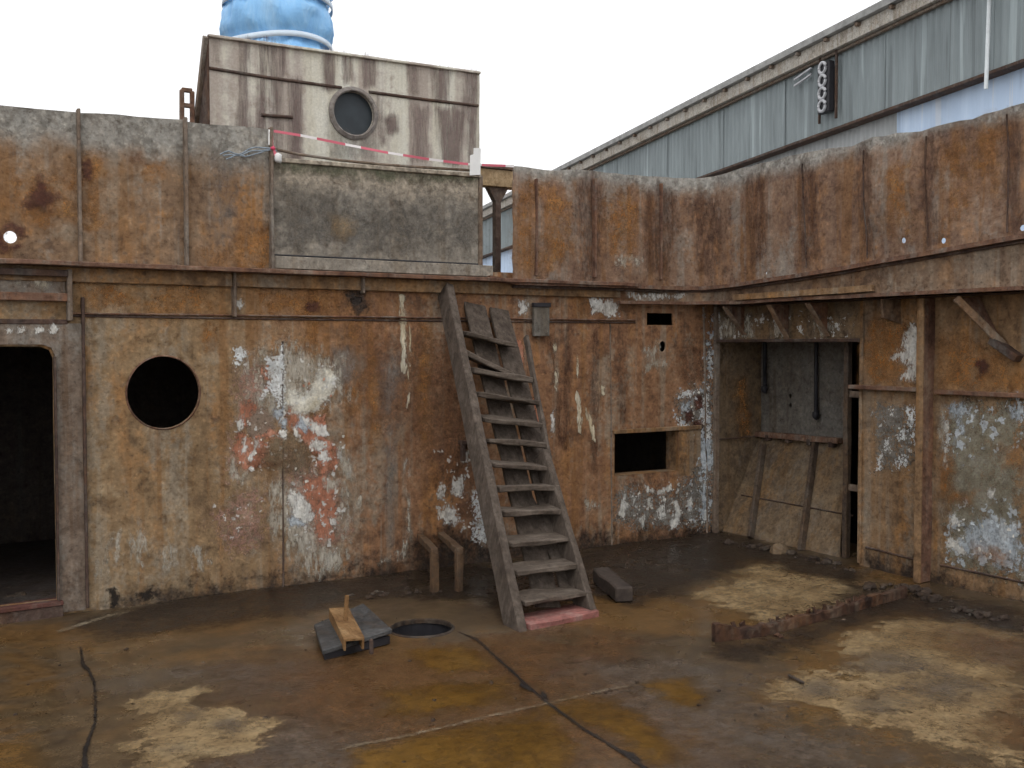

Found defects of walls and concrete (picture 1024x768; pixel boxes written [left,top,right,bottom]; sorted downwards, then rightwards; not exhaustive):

rust [0,159,105,252]
peeling [589,297,618,317]
peeling [789,311,851,339]
peeling [213,341,362,579]
peeling [434,450,487,547]
peeling [613,313,784,534]
peeling [869,402,916,474]
peeling [938,391,1024,586]
rust [108,587,120,609]
crack [80,647,97,768]
crack [462,633,647,768]